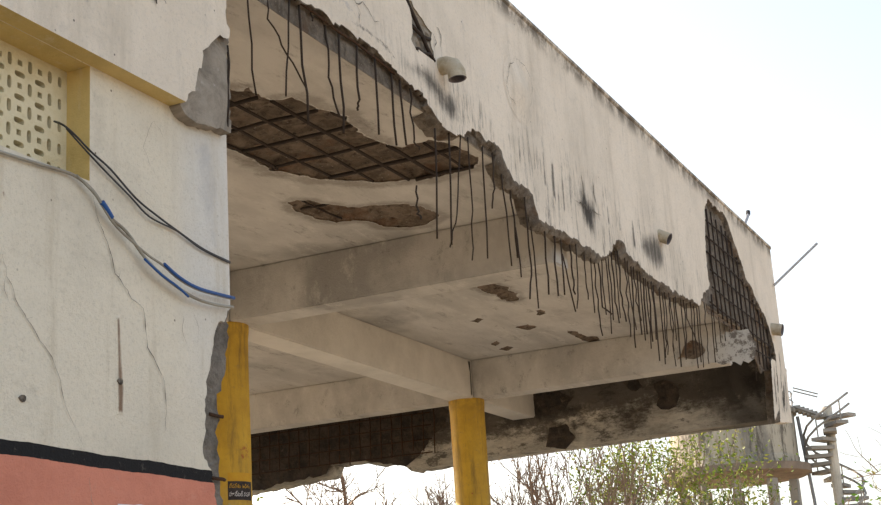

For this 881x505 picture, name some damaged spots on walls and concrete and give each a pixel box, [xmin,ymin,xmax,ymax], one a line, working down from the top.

water stain [183,43,669,282]
spalling [219,0,780,424]
crack [2,254,80,438]
corrosion [115,314,125,417]
spalling [251,407,449,491]
water stain [488,387,609,451]
spalling [546,424,575,449]